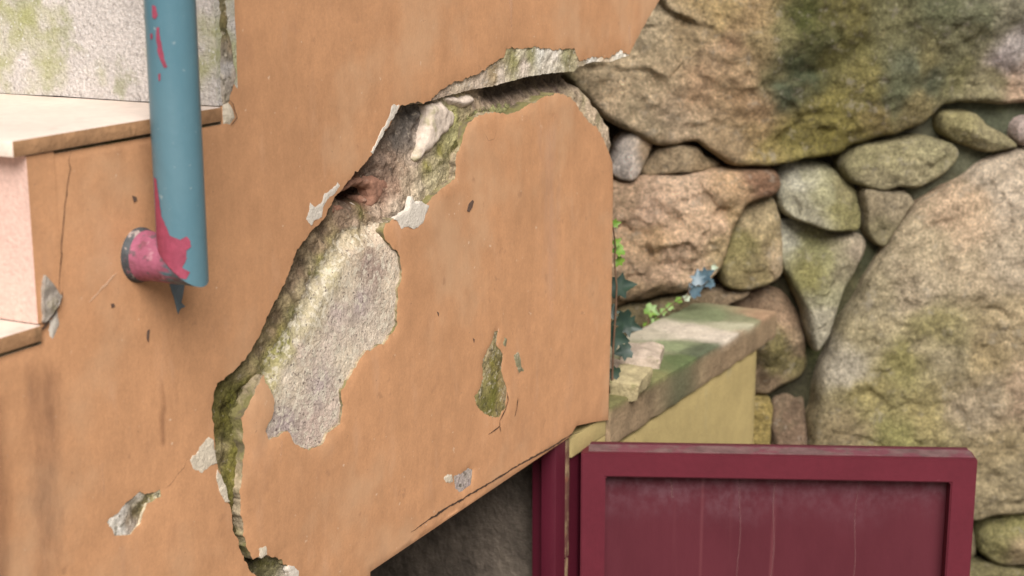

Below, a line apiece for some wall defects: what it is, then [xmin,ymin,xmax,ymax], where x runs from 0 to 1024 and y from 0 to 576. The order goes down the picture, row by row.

peeling [219,0,236,125]
crack [59,153,71,292]
spalling [41,275,63,339]
crack [190,46,629,576]
peeling [474,331,524,435]
spalling [107,490,160,535]
spalling [444,468,472,492]